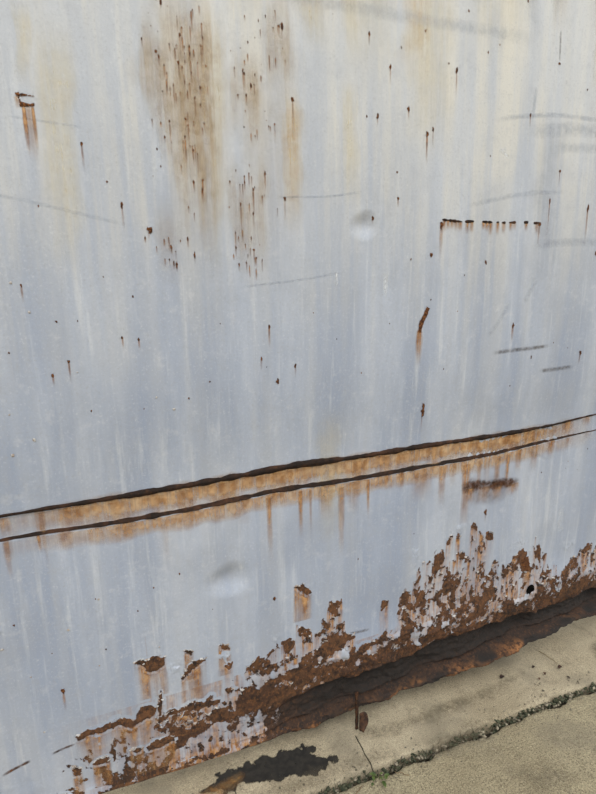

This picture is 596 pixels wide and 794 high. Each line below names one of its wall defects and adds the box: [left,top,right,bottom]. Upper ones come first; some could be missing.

corrosion [169,9,208,107]
corrosion [15,92,37,137]
corrosion [440,218,541,230]
corrosion [60,428,553,535]
corrosion [521,557,530,580]
peeling [57,518,596,794]